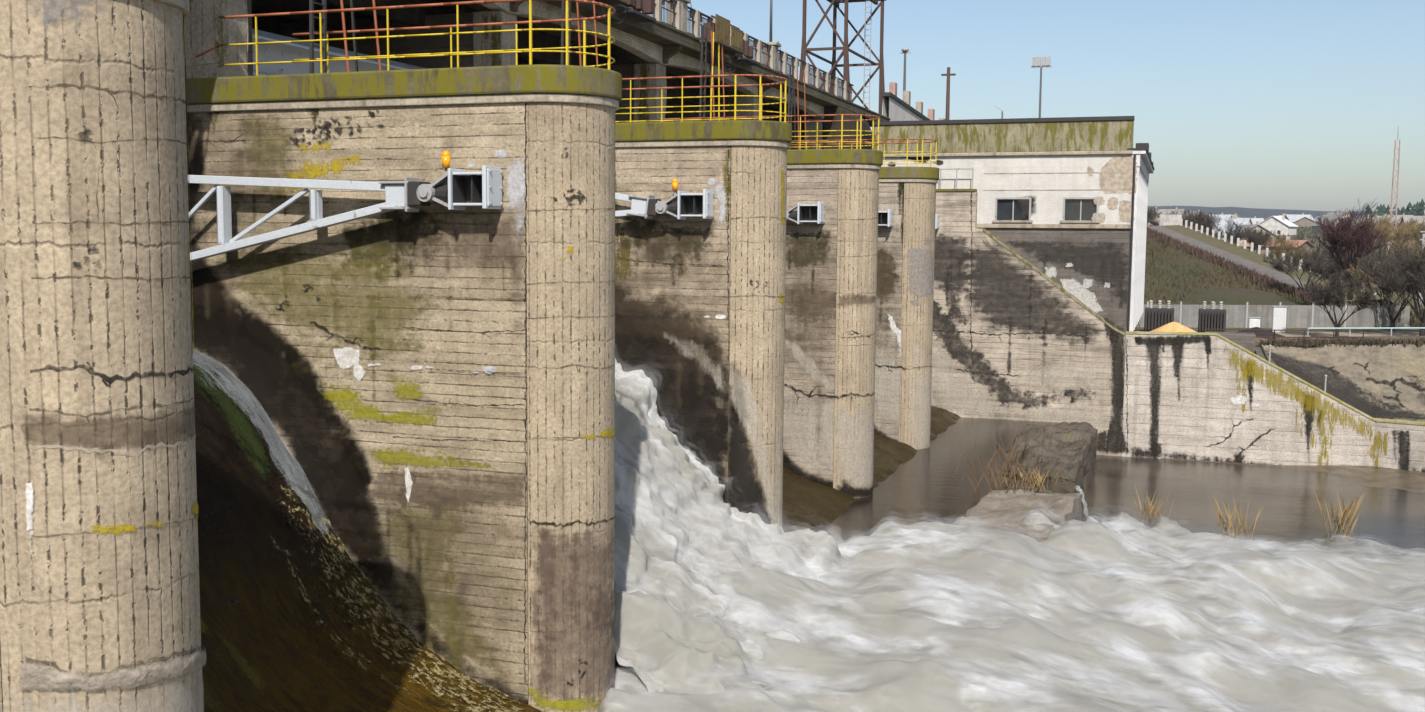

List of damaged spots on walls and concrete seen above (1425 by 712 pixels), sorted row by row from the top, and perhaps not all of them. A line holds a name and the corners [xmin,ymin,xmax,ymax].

crack [29,361,196,464]
damp [186,116,615,712]
damp [933,234,1261,464]
crack [1207,418,1274,459]
damp [1266,349,1425,472]